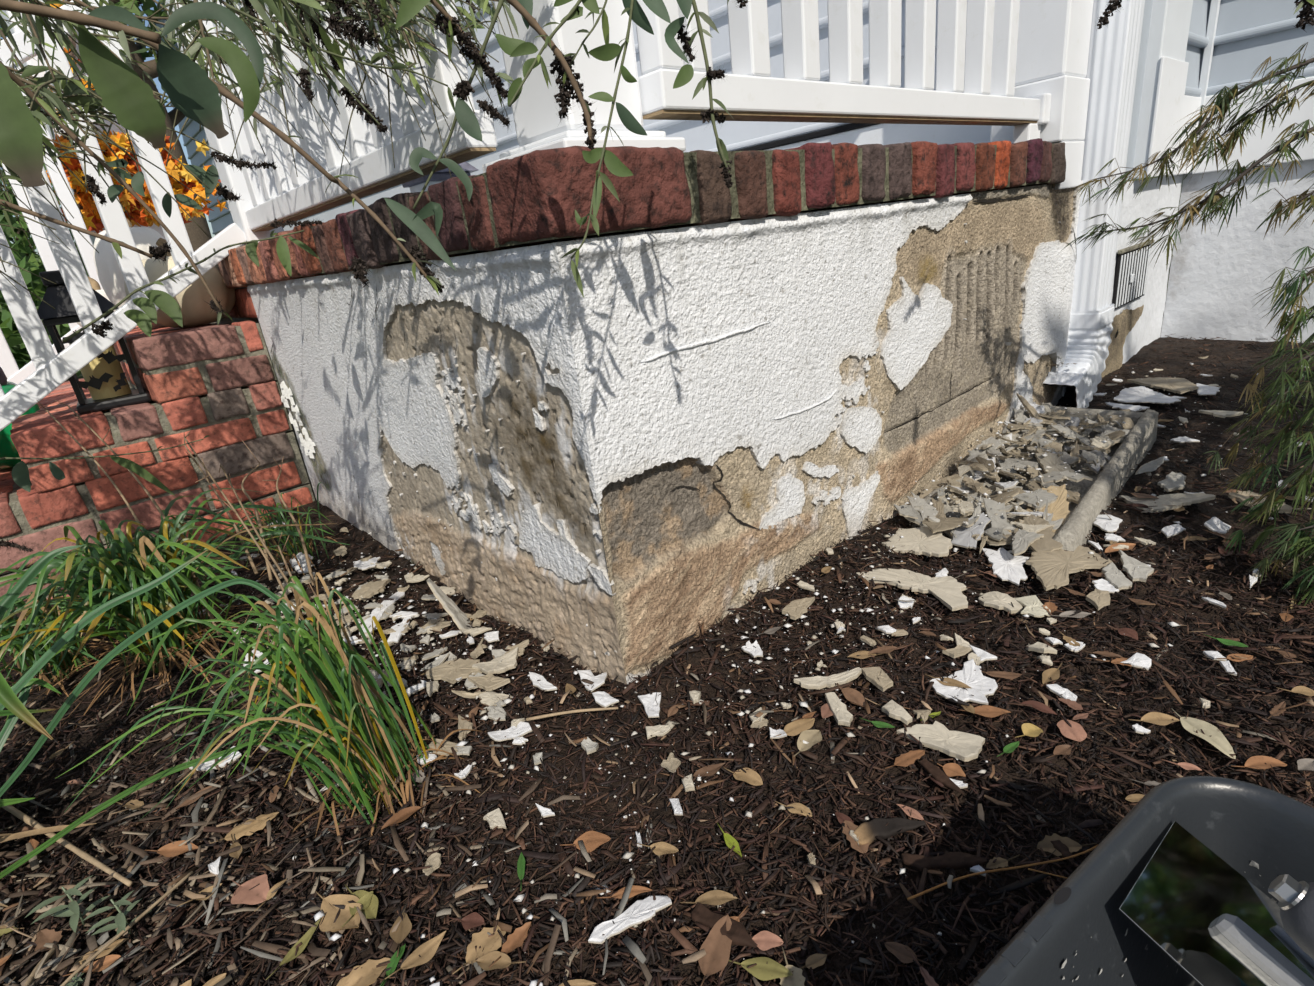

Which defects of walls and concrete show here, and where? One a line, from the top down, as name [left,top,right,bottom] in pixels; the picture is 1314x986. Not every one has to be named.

flaking render [381,184,1077,708]
crack [669,464,760,530]
flaking render [638,692,661,718]